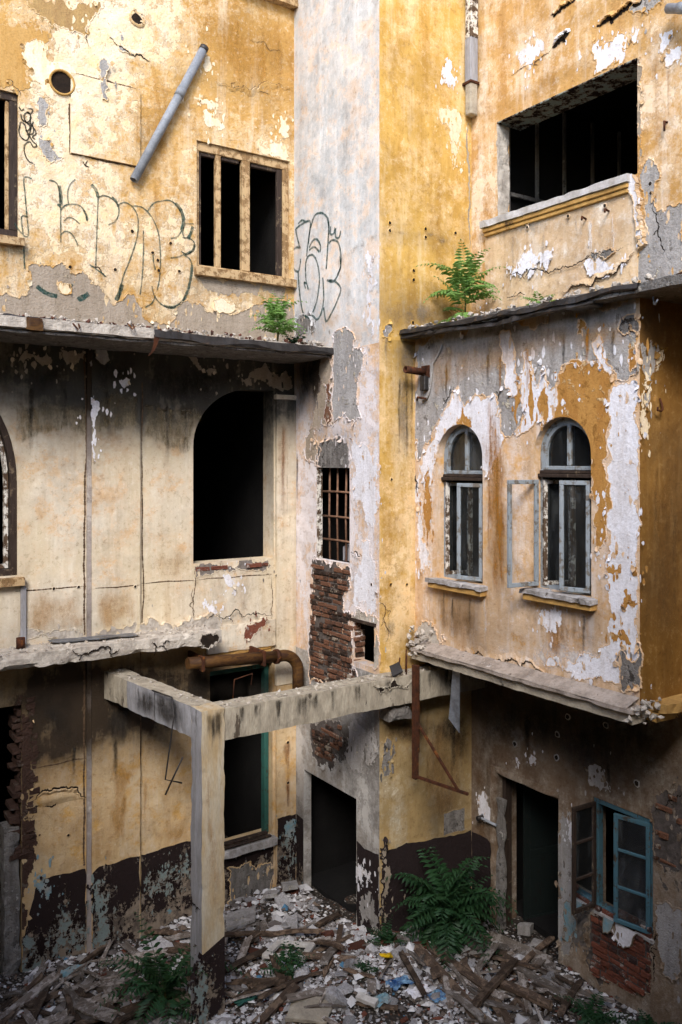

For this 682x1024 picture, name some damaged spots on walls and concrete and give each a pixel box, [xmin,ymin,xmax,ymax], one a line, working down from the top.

peeling [509,31,544,90]
flaking render [577,0,682,287]
peeling [502,240,554,289]
crack [507,247,634,298]
flaking render [0,251,412,695]
flaking render [413,298,668,694]
crack [190,590,271,622]
crack [22,786,86,856]
peeling [0,695,682,1024]